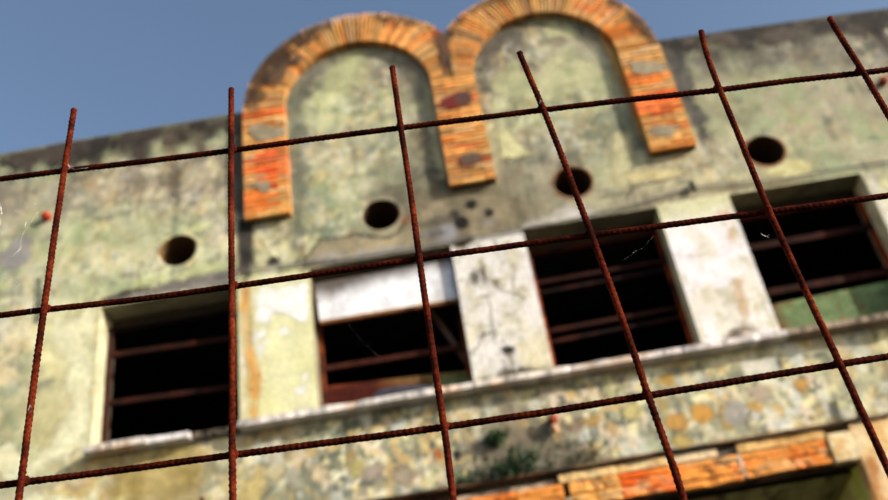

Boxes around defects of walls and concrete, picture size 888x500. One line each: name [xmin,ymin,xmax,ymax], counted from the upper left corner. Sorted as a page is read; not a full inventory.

peeling [313,49,370,115]
leakage [607,0,888,148]
leakage [30,277,43,326]
rust [239,286,265,421]
spalling [0,58,683,500]
crack [473,275,526,351]
spalling [404,16,888,500]
leakage [444,399,622,493]